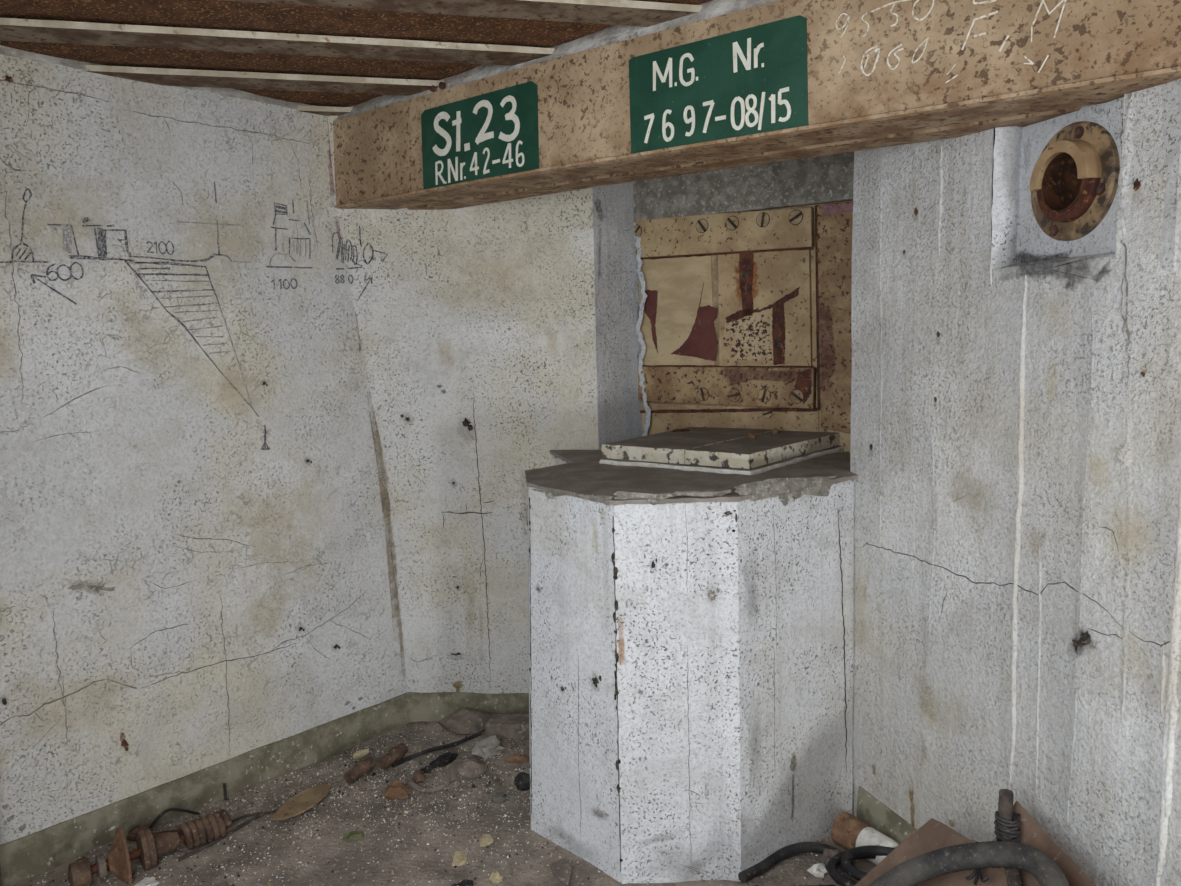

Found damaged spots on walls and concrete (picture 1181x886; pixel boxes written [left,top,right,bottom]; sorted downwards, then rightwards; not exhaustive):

rust [723,252,812,404]
crack [145,533,333,589]
crack [0,591,370,752]
spalling [528,476,837,872]
crack [838,516,1170,772]